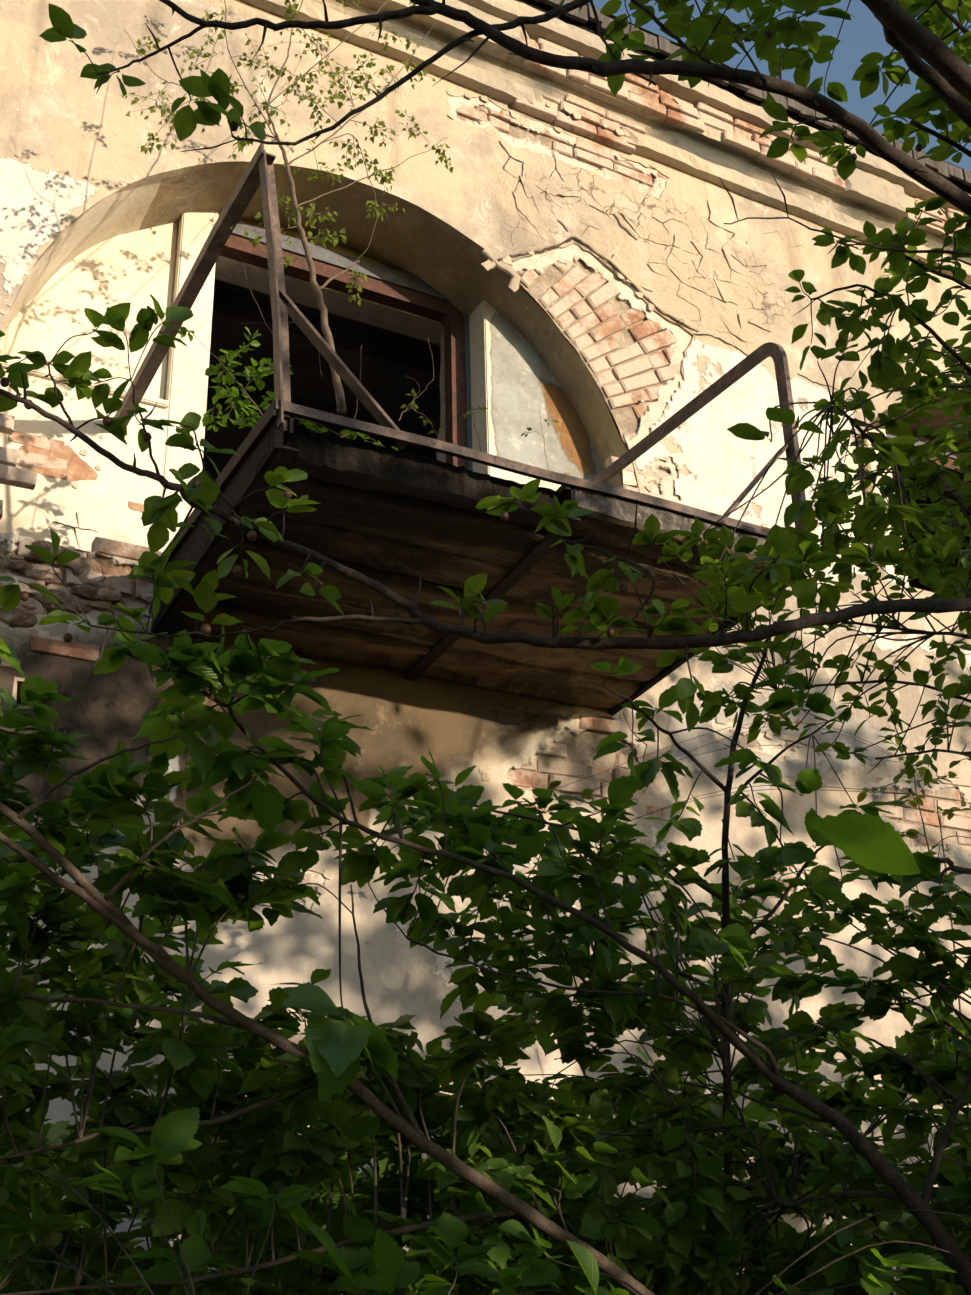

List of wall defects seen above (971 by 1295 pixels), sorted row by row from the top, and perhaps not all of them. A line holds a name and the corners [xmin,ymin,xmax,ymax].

crack [481,141,808,366]
flaking render [447,36,860,552]
flaking render [0,413,163,662]
peeling [805,563,838,588]
flaking render [865,770,971,863]